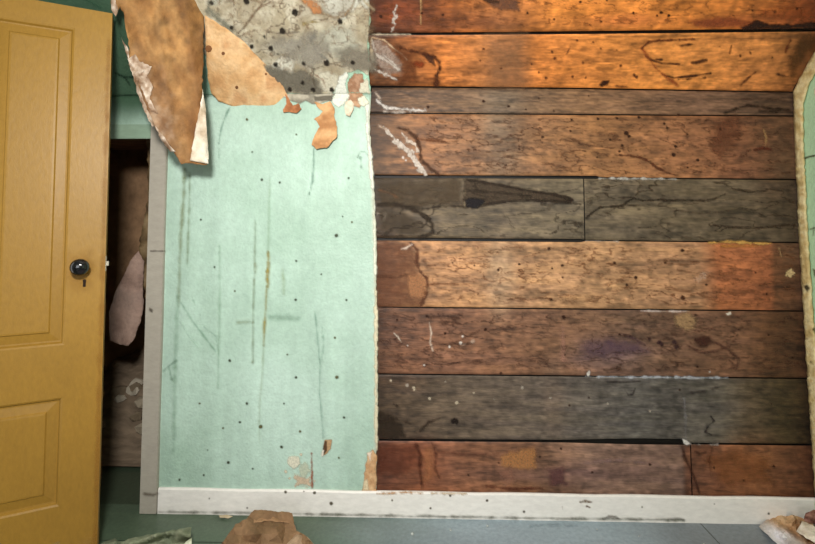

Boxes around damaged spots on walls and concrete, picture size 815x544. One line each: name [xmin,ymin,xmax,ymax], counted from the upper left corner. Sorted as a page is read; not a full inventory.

flaking render [195,0,377,279]